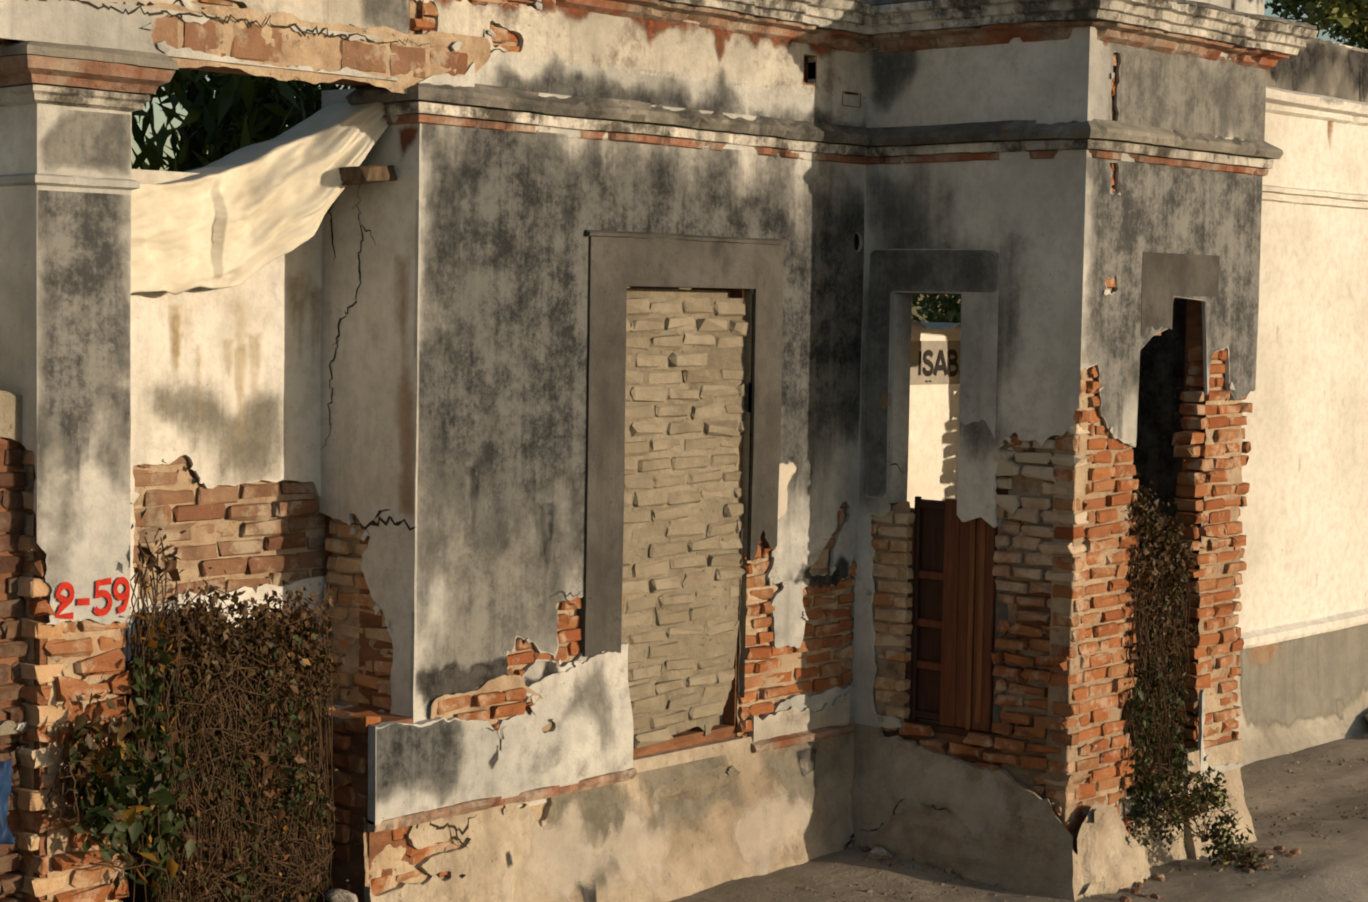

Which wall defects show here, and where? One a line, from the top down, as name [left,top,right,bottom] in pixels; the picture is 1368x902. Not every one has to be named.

crack [27,0,450,48]
spalling [142,0,521,94]
leakage [1113,42,1368,141]
spalling [0,437,132,902]
leakage [37,190,131,513]
spalling [130,455,393,710]
crack [320,186,375,450]
crack [352,509,418,531]
spalling [431,597,584,732]
leakage [417,123,1015,701]
spalling [736,365,1139,854]
leakage [1087,158,1263,540]